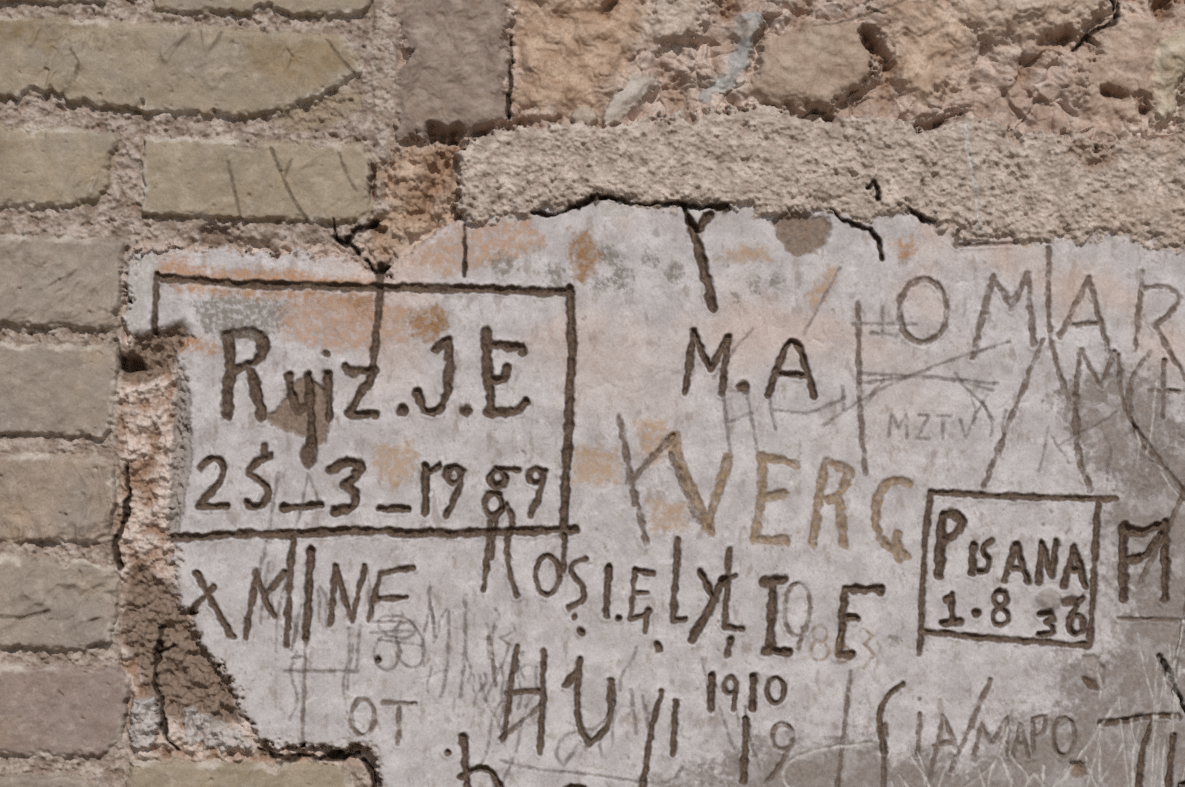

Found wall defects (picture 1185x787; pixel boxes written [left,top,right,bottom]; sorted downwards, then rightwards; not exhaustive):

crack [1071,0,1119,52]
spalling [599,200,632,216]
crack [531,192,730,223]
spalling [122,247,192,536]
spalling [125,566,252,751]